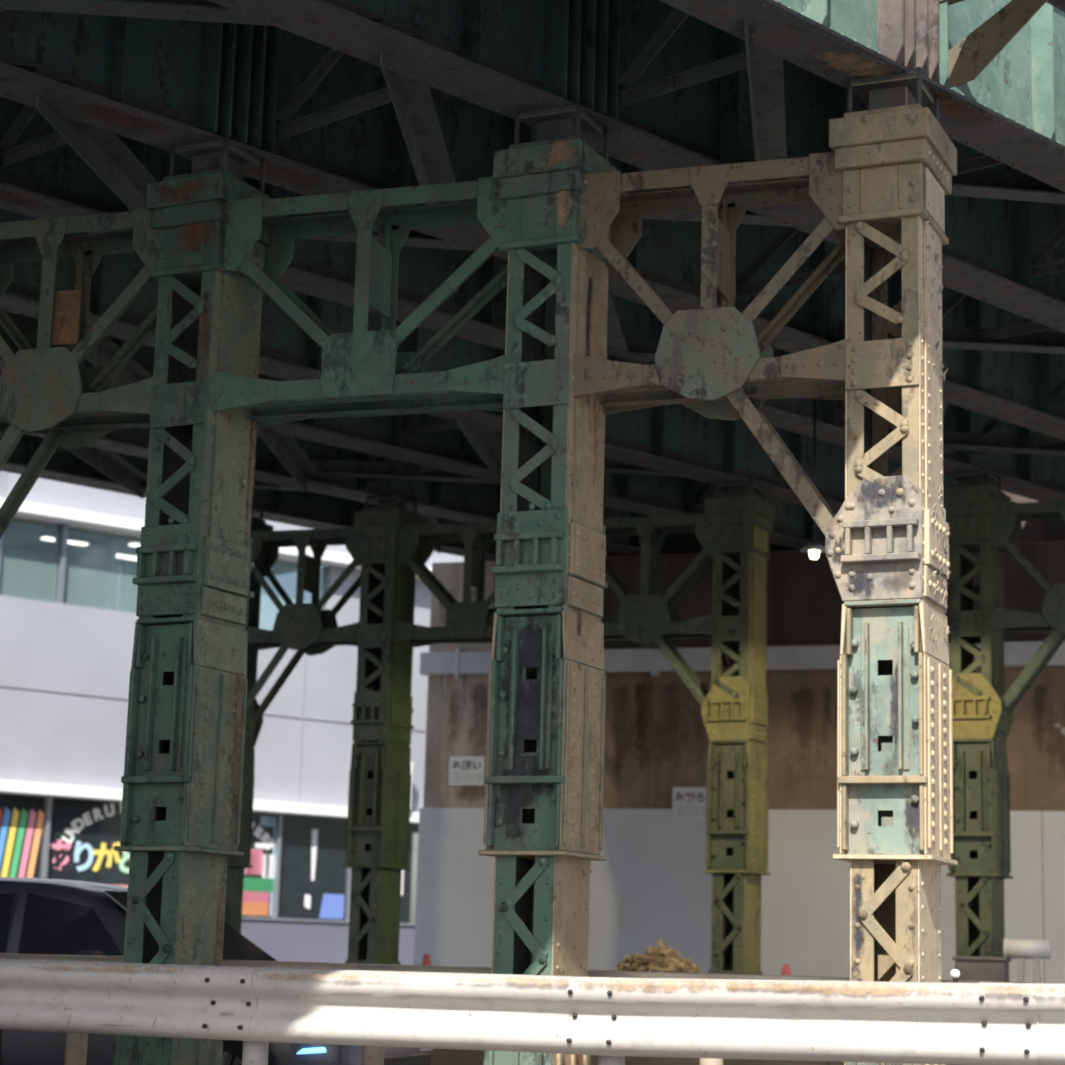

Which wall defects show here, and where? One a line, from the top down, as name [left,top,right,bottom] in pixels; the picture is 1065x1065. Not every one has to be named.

peeling [859,476,905,508]
peeling [833,537,845,562]
peeling [848,572,874,595]
damp [495,606,556,838]
damp [905,800,920,836]
damp [851,874,864,981]